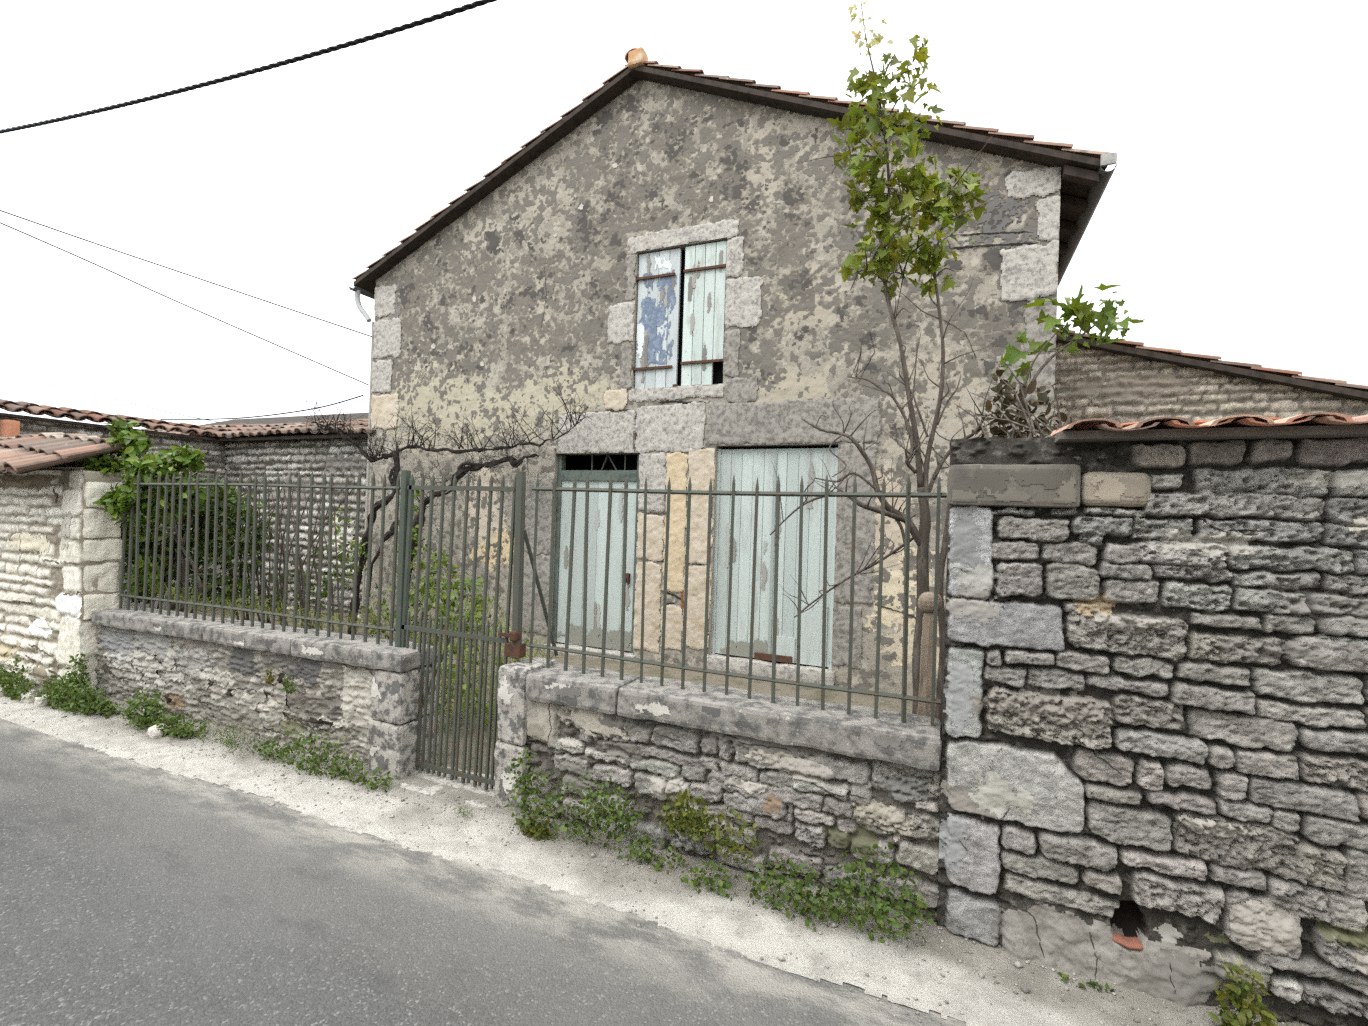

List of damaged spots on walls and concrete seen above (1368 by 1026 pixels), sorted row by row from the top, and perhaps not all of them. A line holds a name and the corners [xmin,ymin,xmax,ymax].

peeling [747,365,837,403]
spalling [1110,900,1183,944]